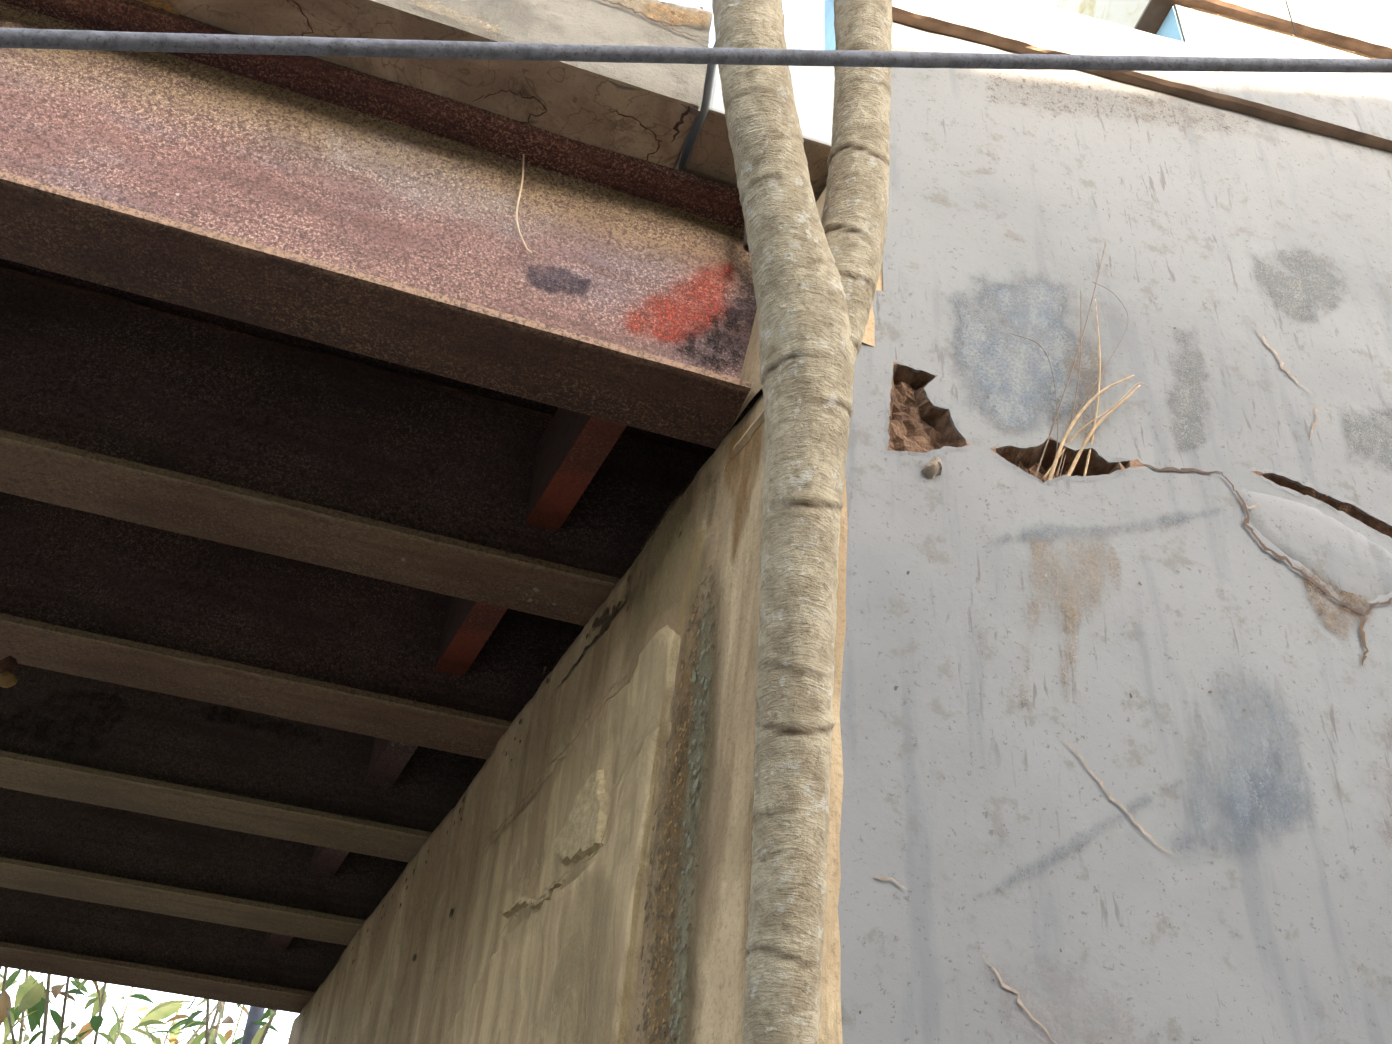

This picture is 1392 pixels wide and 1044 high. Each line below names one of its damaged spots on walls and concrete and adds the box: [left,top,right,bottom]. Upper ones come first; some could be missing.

rust [528,265,590,295]
rust [627,265,757,371]
spalling [883,357,973,479]
crack [989,431,1392,665]
leakage [618,477,717,1044]